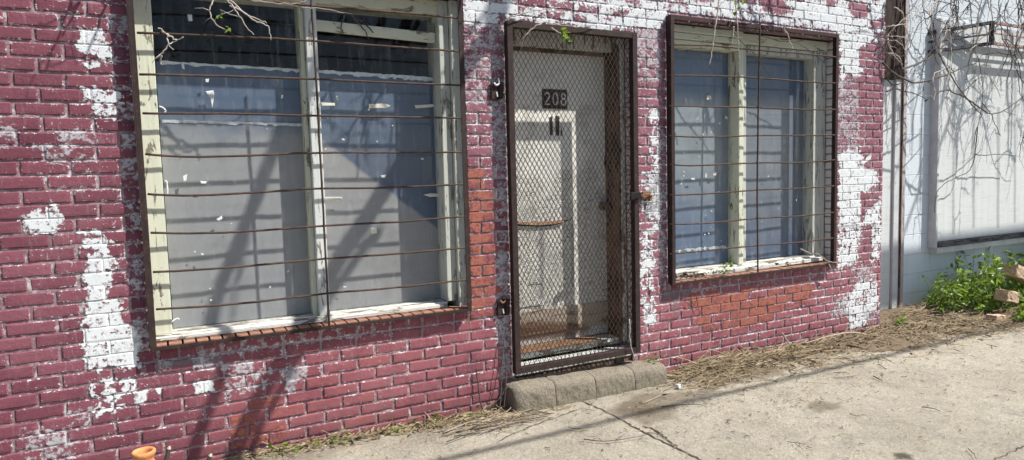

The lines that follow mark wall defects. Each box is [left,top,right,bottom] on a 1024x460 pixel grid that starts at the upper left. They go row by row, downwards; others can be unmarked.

peeling [0,14,138,181]
peeling [463,0,886,376]
peeling [19,200,172,460]